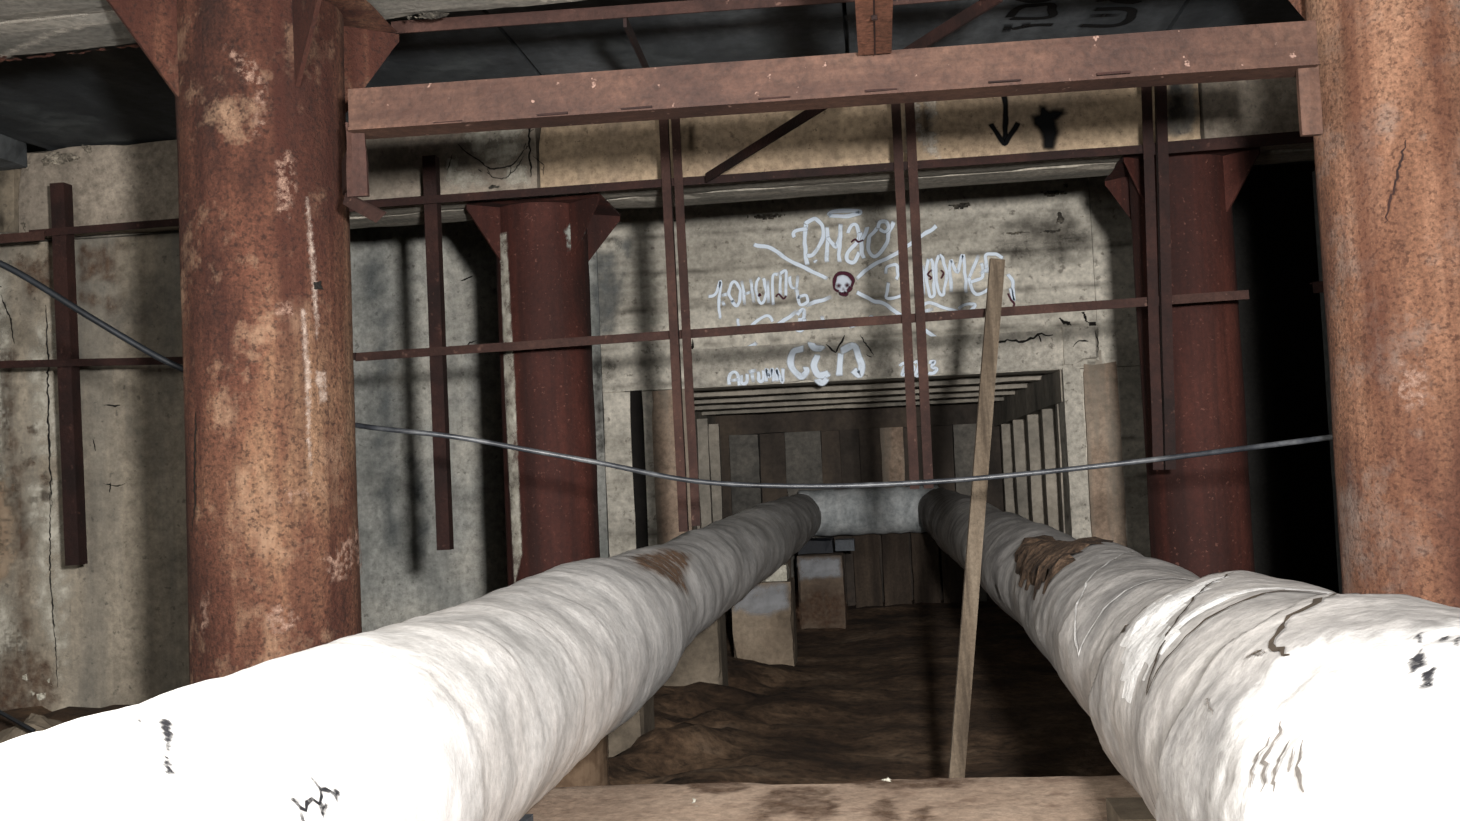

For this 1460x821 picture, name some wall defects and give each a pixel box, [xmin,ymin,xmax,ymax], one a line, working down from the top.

crack [0,286,58,687]